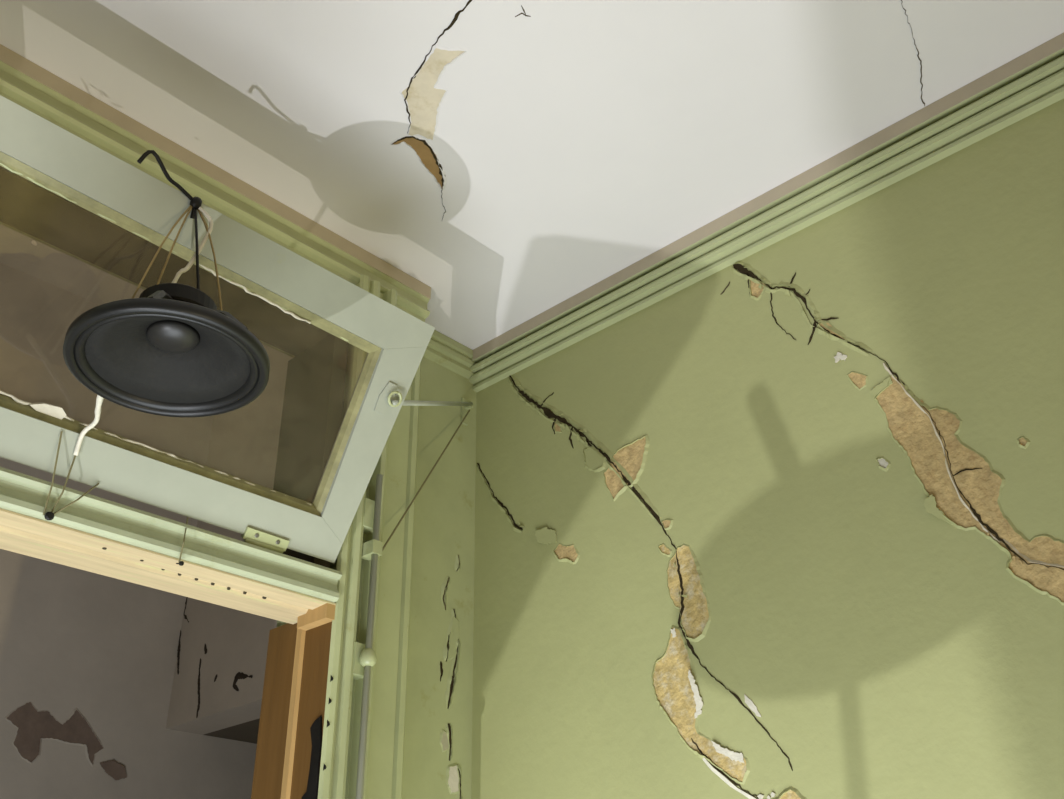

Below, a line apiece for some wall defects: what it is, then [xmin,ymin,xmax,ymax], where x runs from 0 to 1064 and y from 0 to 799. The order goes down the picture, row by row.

peeling [390,45,467,190]
crack [393,0,472,219]
crack [901,0,925,106]
crack [476,463,524,533]
peeling [583,434,650,501]
crack [720,261,1064,570]
peeling [818,321,1064,606]
crack [508,375,793,771]
peeling [5,701,127,780]
peeling [651,518,750,785]
crack [691,738,757,799]
peeling [744,694,762,717]